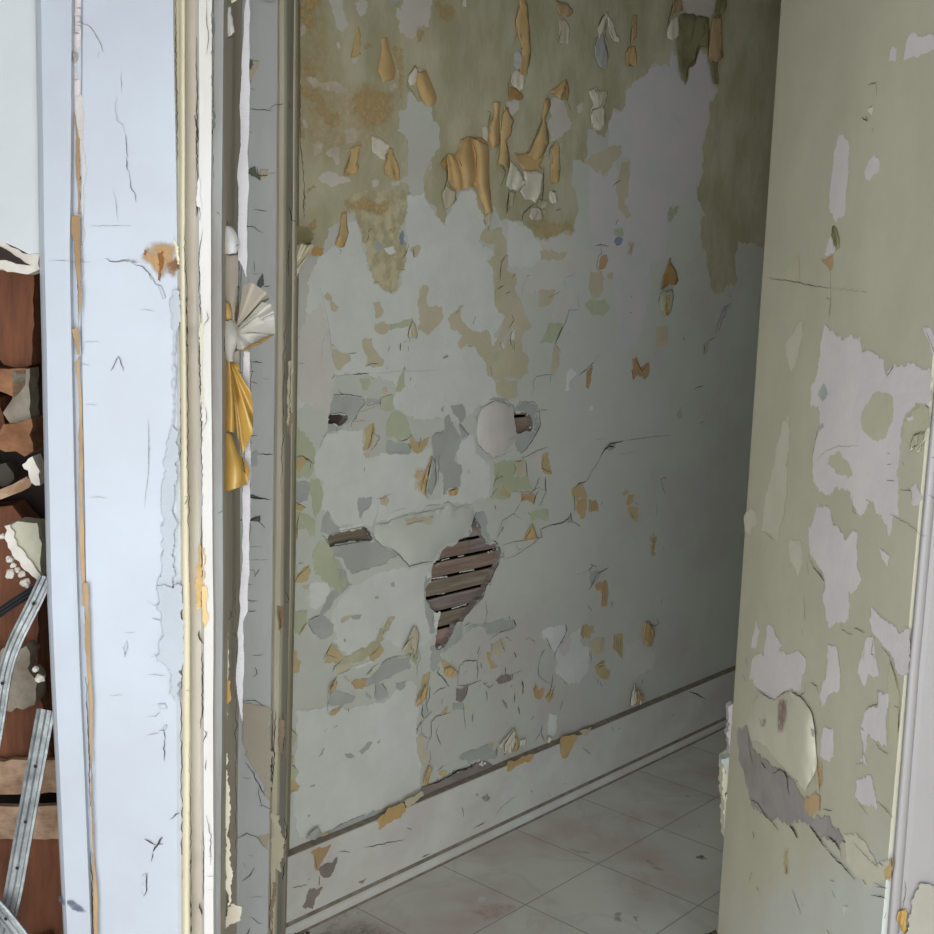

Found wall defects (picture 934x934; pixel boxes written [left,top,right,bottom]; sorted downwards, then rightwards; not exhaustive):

crack [54,0,136,934]
peeling [225,0,781,934]
crack [492,408,703,559]
flaking render [718,701,894,898]
peeling [744,320,932,818]